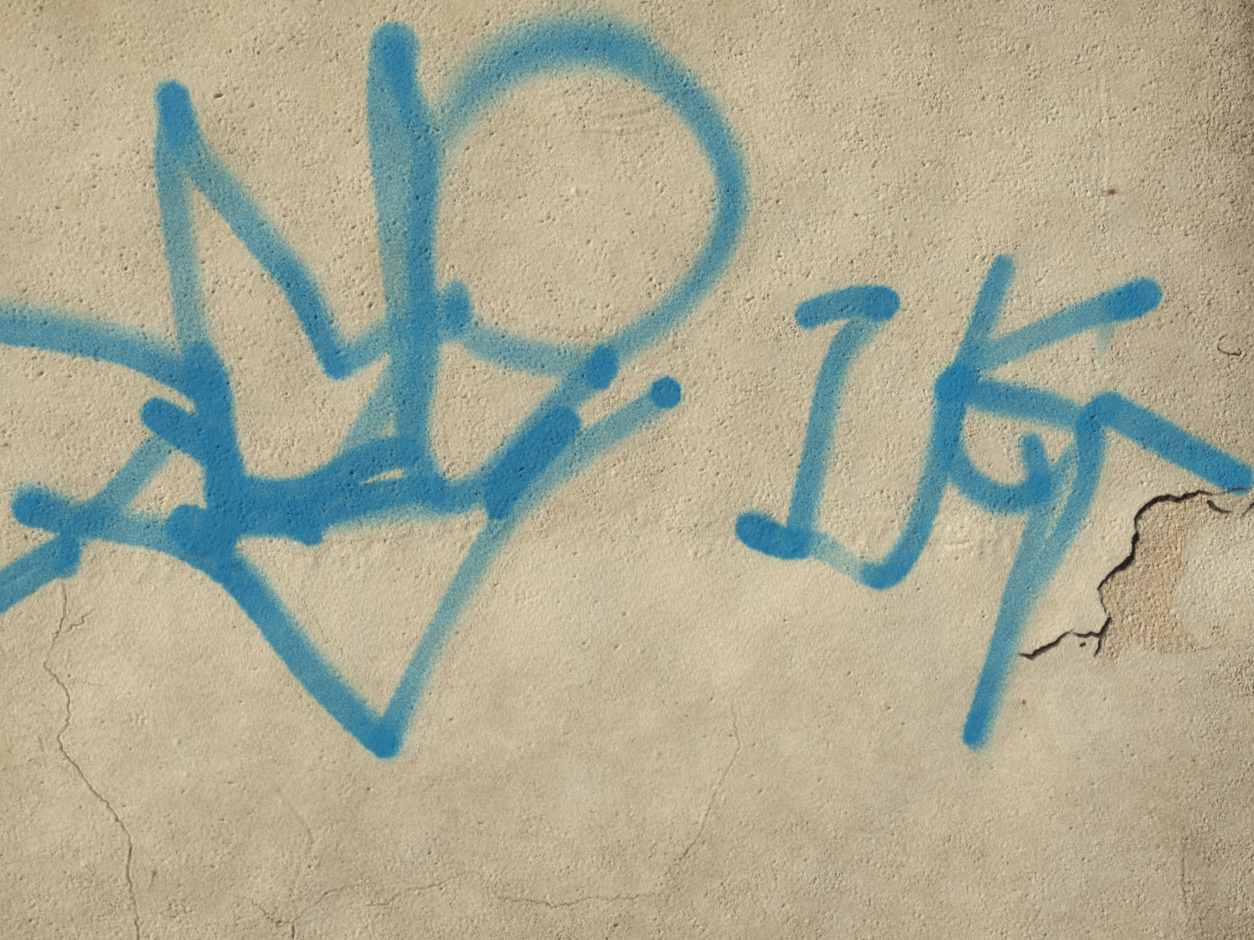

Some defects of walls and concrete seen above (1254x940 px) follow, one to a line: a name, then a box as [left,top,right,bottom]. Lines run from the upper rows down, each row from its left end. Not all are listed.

spalling [1099,491,1242,671]
crack [0,582,142,940]
crack [229,700,742,940]